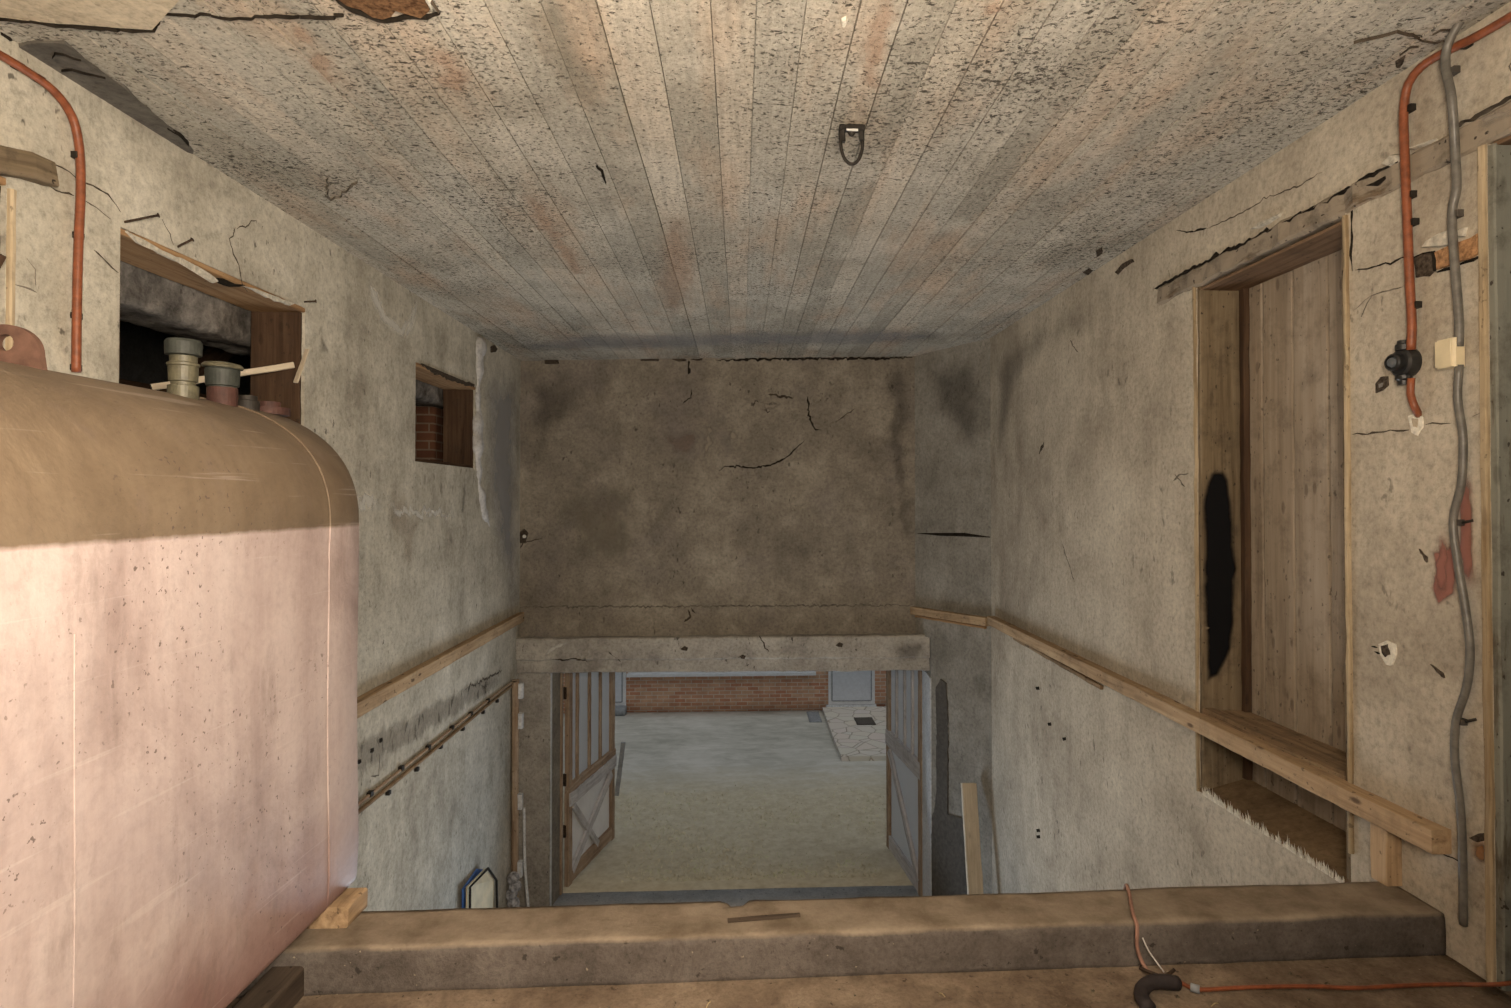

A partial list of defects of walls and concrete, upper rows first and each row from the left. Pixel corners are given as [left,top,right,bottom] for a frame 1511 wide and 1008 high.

peeling [0,0,179,33]
spalling [336,0,441,23]
crack [1354,29,1450,56]
flaking render [1448,95,1511,129]
crack [229,220,256,291]
flaking render [1357,227,1478,278]
crack [683,356,912,471]
crack [918,531,990,539]